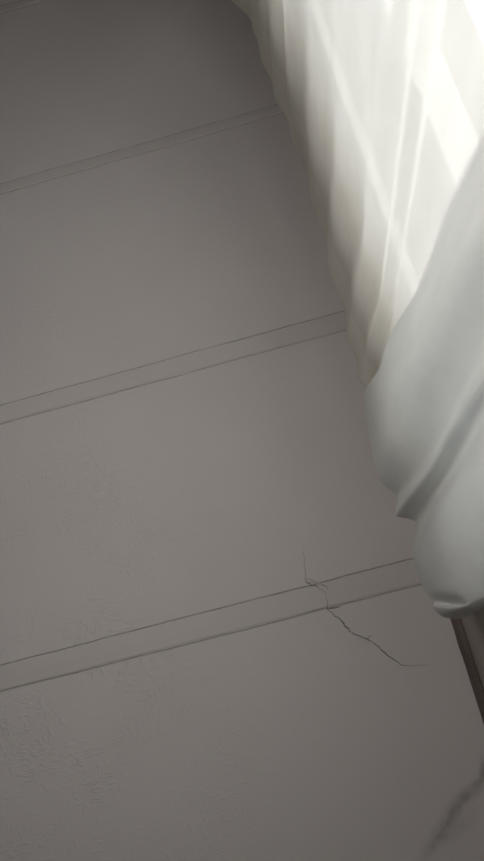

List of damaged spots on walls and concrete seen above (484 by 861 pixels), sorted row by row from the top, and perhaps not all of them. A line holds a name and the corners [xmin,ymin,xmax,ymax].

crack [303,552,429,666]